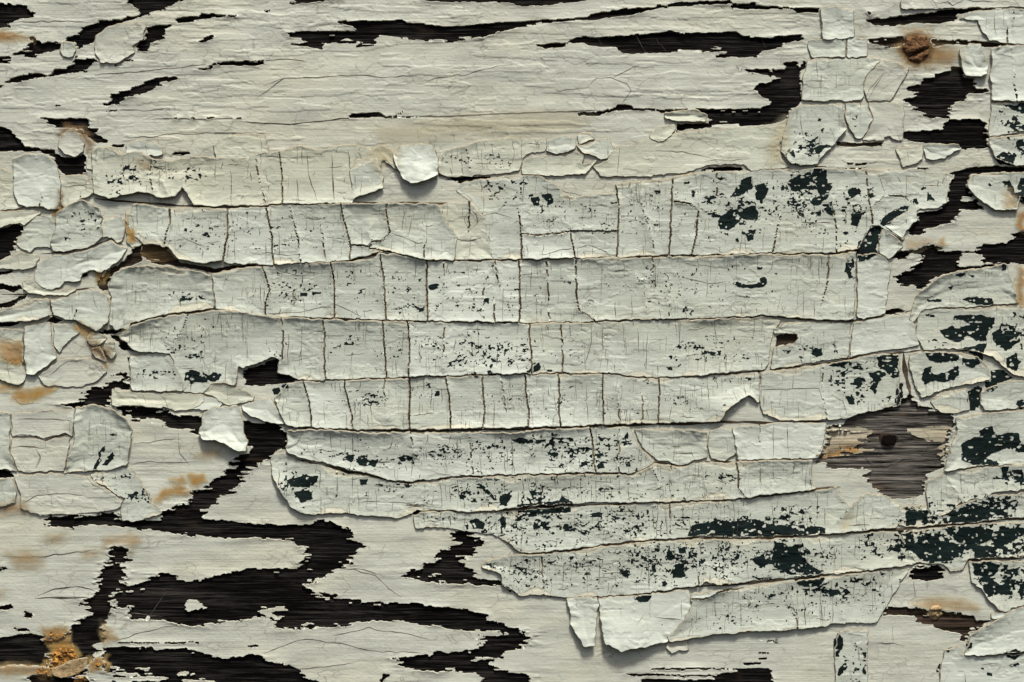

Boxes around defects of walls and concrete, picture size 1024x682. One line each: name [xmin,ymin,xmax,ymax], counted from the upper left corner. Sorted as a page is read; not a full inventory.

peeling [288,0,819,50]
peeling [537,31,804,58]
corrosion [898,32,956,65]
peeling [578,0,1024,168]
peeling [0,125,1024,431]
crack [300,350,920,397]
crack [290,420,826,432]
crack [296,459,680,483]
peeling [0,353,1024,682]
crack [522,518,1024,554]
crack [591,563,923,598]
corrosion [0,627,110,682]